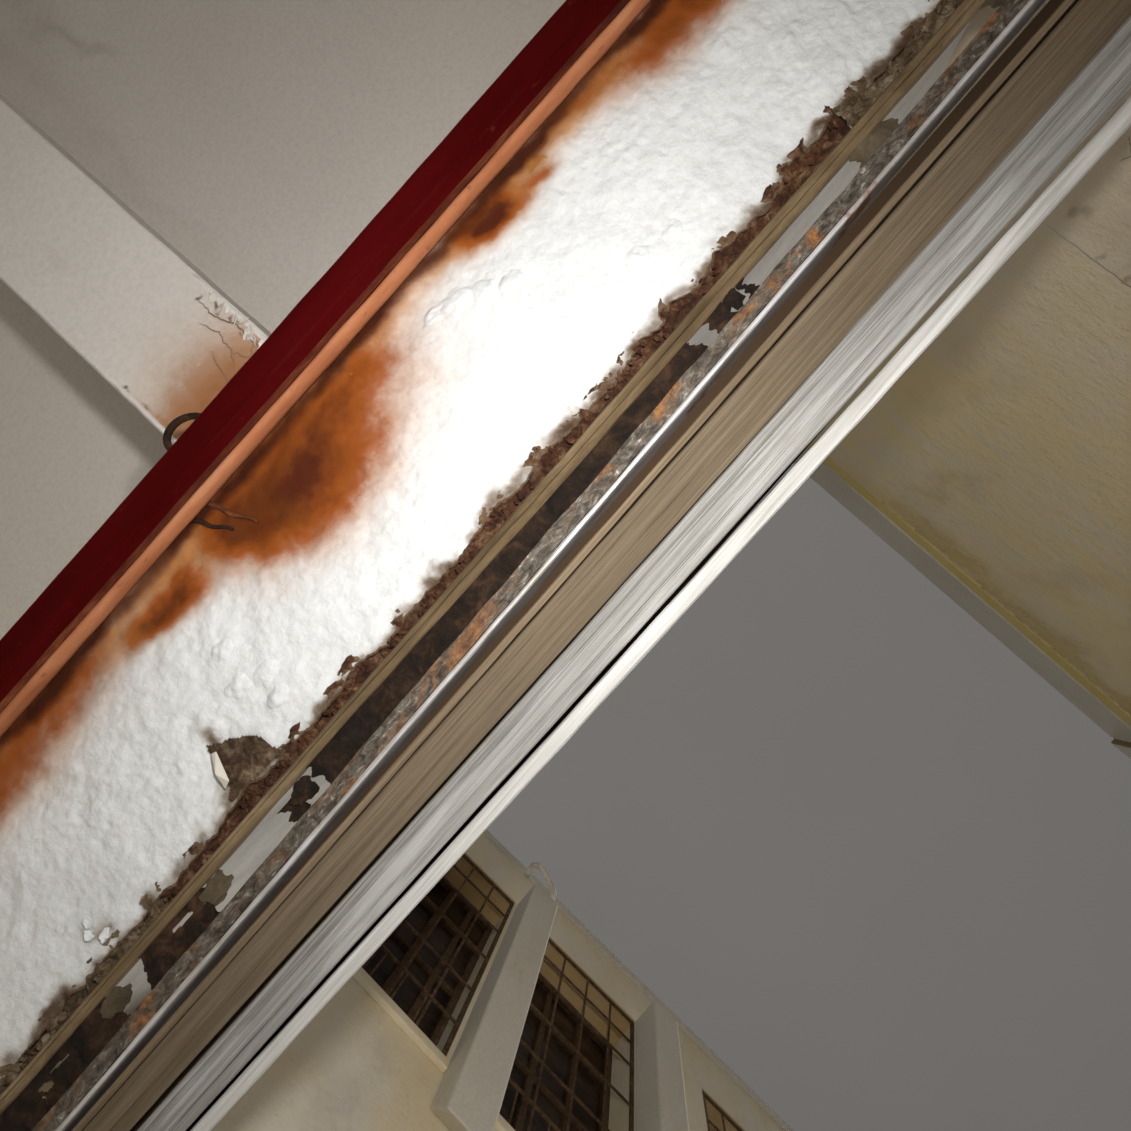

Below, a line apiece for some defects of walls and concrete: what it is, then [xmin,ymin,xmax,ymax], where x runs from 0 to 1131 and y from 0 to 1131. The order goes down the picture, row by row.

spalling [522,0,964,489]
crack [1047,225,1131,288]
crack [199,302,258,383]
spalling [196,289,266,349]
rust [701,278,760,334]
rust [0,0,726,822]
spalling [0,474,534,1095]